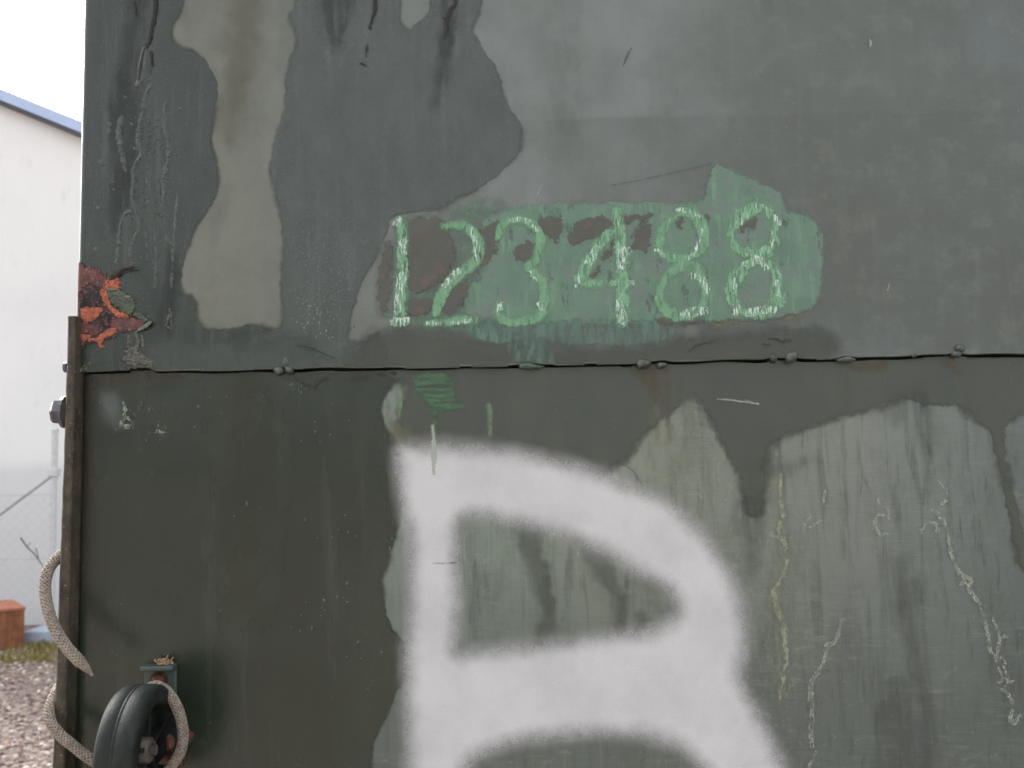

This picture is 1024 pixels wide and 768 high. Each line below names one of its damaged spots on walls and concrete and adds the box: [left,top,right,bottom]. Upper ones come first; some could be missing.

rust [77,262,152,350]